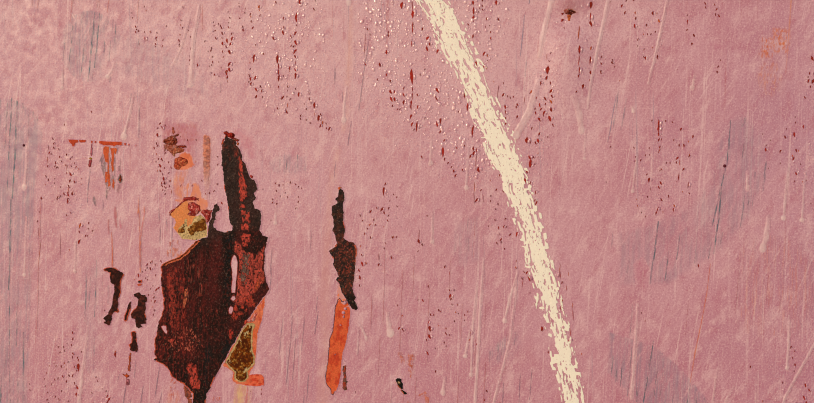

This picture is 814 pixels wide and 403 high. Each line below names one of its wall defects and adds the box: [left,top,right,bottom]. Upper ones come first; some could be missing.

rust [162,117,206,200]
peeling [102,122,302,403]
rust [313,144,343,403]
spalling [177,0,533,285]
peeling [325,182,424,403]
spalling [397,265,481,355]